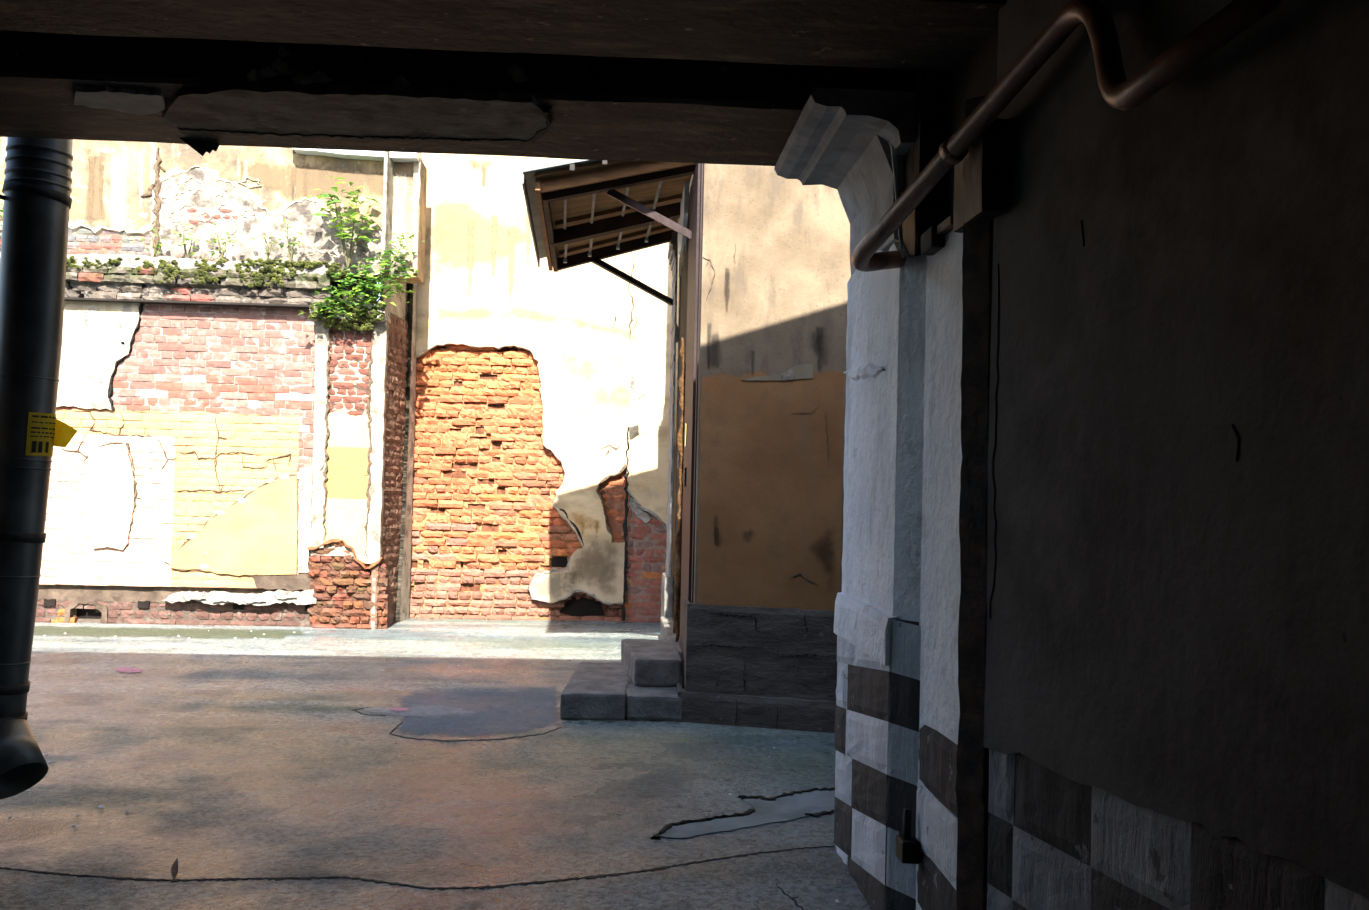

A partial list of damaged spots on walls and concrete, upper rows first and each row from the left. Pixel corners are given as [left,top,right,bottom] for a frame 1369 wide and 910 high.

flaking render [56,301,143,410]
crack [62,328,331,539]
flaking render [67,165,409,276]
flaking render [171,467,389,629]
crack [362,327,374,561]
water stain [433,204,617,331]
flaking render [409,342,667,623]
crack [612,252,638,347]